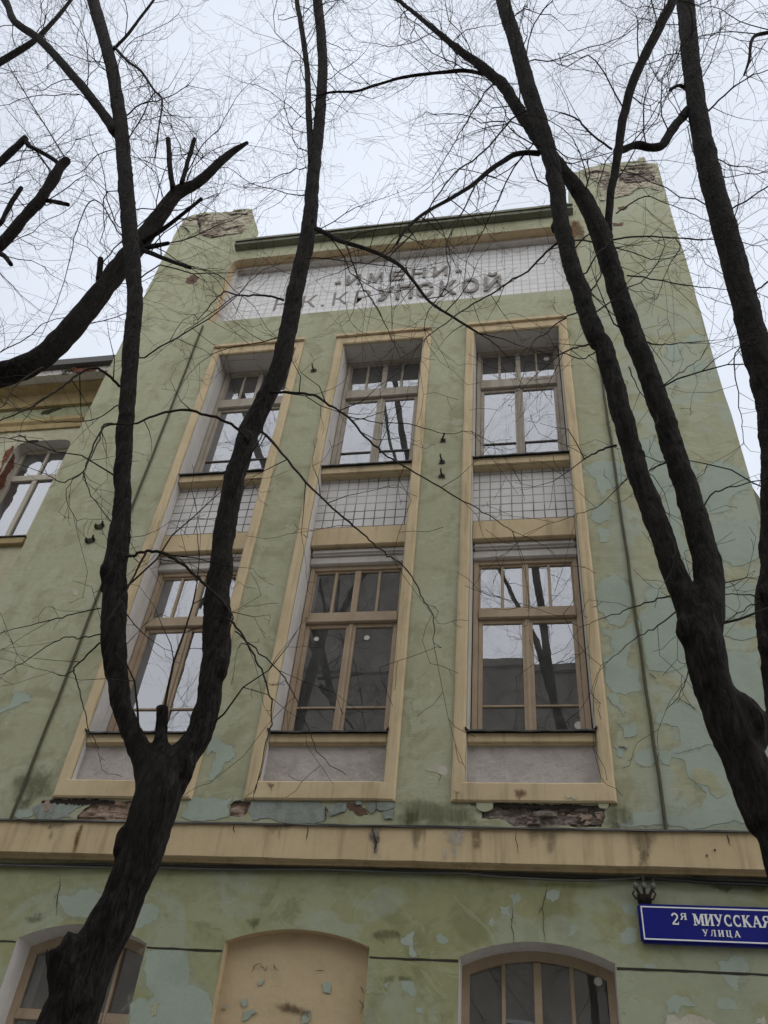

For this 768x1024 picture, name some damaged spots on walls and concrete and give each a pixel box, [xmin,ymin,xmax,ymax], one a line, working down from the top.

spalling [181,210,255,237]
spalling [584,163,660,226]
peeling [640,436,693,581]
peeling [690,461,760,566]
peeling [595,573,686,695]
peeling [723,583,765,711]
peeling [470,702,744,830]
spalling [13,798,132,820]
peeling [181,797,395,853]
peeling [58,888,102,918]
peeling [135,904,159,928]
crack [511,885,547,942]